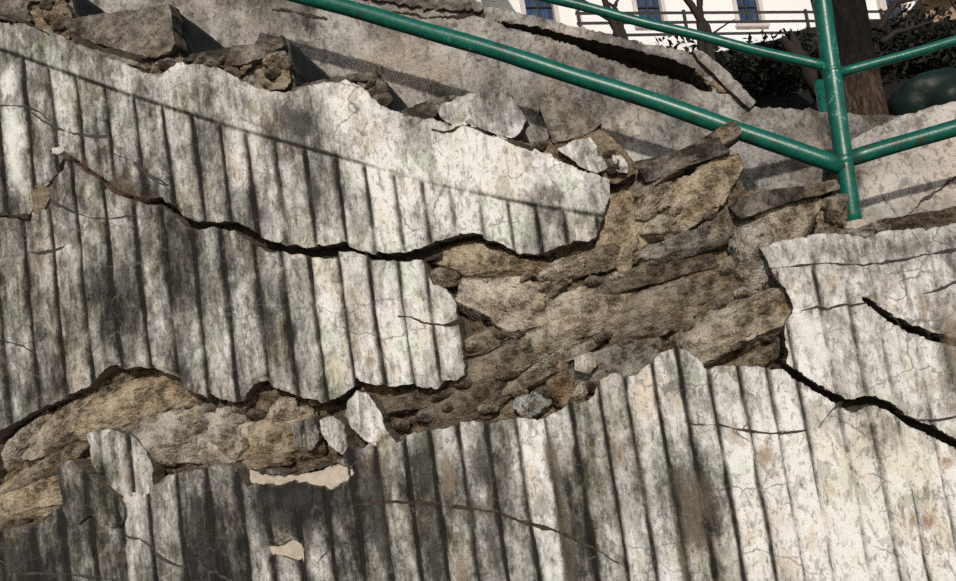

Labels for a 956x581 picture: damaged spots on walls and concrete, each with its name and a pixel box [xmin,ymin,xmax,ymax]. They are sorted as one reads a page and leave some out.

spalling [30,0,81,40]
crack [392,11,485,19]
spalling [145,51,303,92]
crack [582,50,730,94]
crack [0,105,443,266]
spalling [0,120,849,531]
crack [801,299,956,350]
crack [686,359,956,449]